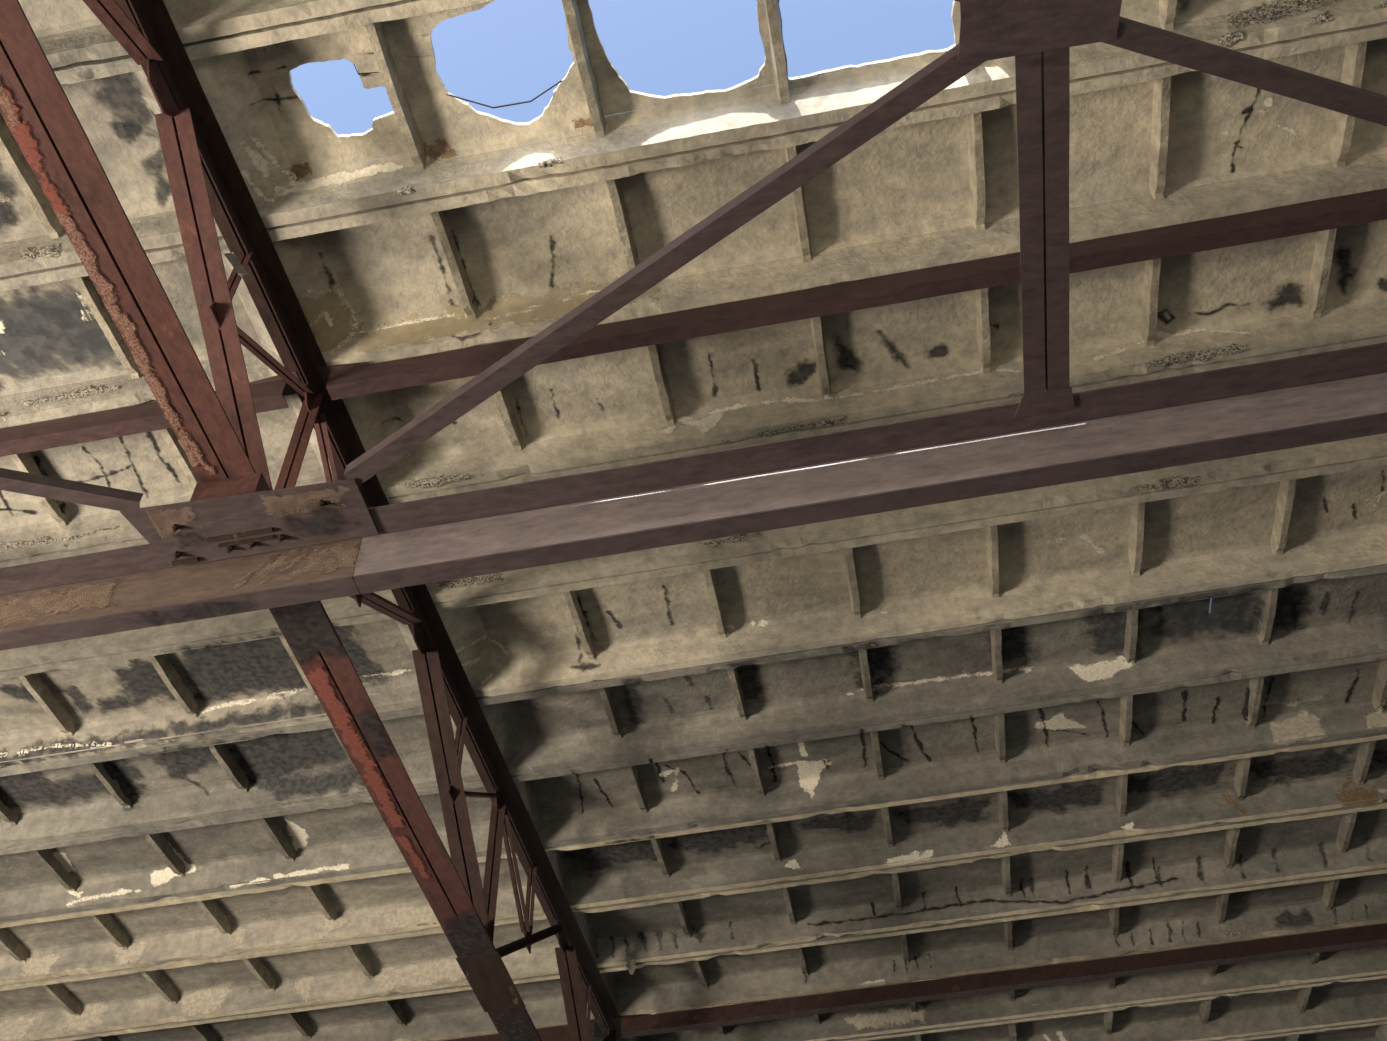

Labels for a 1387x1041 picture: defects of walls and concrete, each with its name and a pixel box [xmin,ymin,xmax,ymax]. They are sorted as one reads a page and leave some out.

crack [1230,88,1260,173]
damp [0,175,18,228]
damp [0,288,122,377]
damp [659,331,1023,437]
damp [333,623,411,685]
damp [0,631,365,810]
crack [572,772,613,812]
crack [648,758,700,794]
crack [723,746,777,786]
damp [66,841,196,906]
damp [230,818,350,889]
crack [808,858,1178,926]